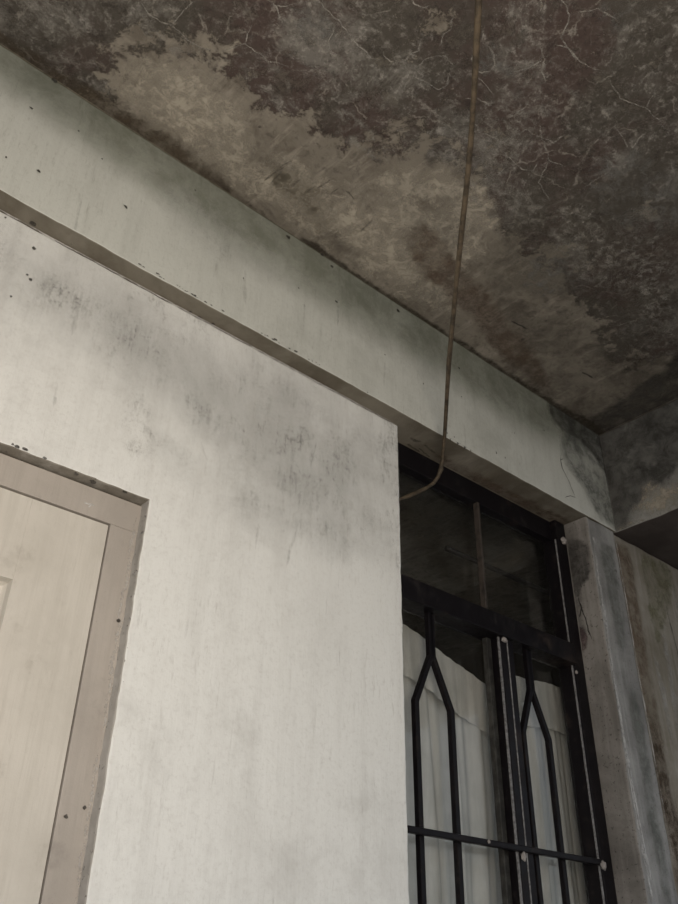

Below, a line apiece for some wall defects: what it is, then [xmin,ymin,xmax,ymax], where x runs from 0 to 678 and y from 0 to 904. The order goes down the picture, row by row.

crack [328,10,449,90]
crack [471,0,606,82]
crack [475,108,561,199]
leakage [0,0,678,529]
leakage [615,686,672,862]